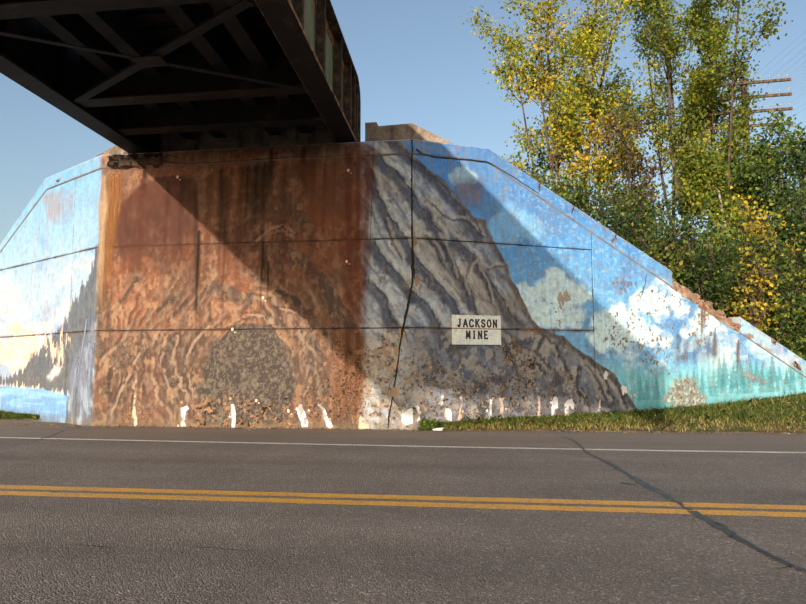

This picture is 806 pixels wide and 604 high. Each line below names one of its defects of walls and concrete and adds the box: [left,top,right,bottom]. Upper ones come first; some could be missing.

rust [105,174,120,270]
crack [386,139,542,428]
spalling [603,280,753,371]
peeling [177,328,601,430]